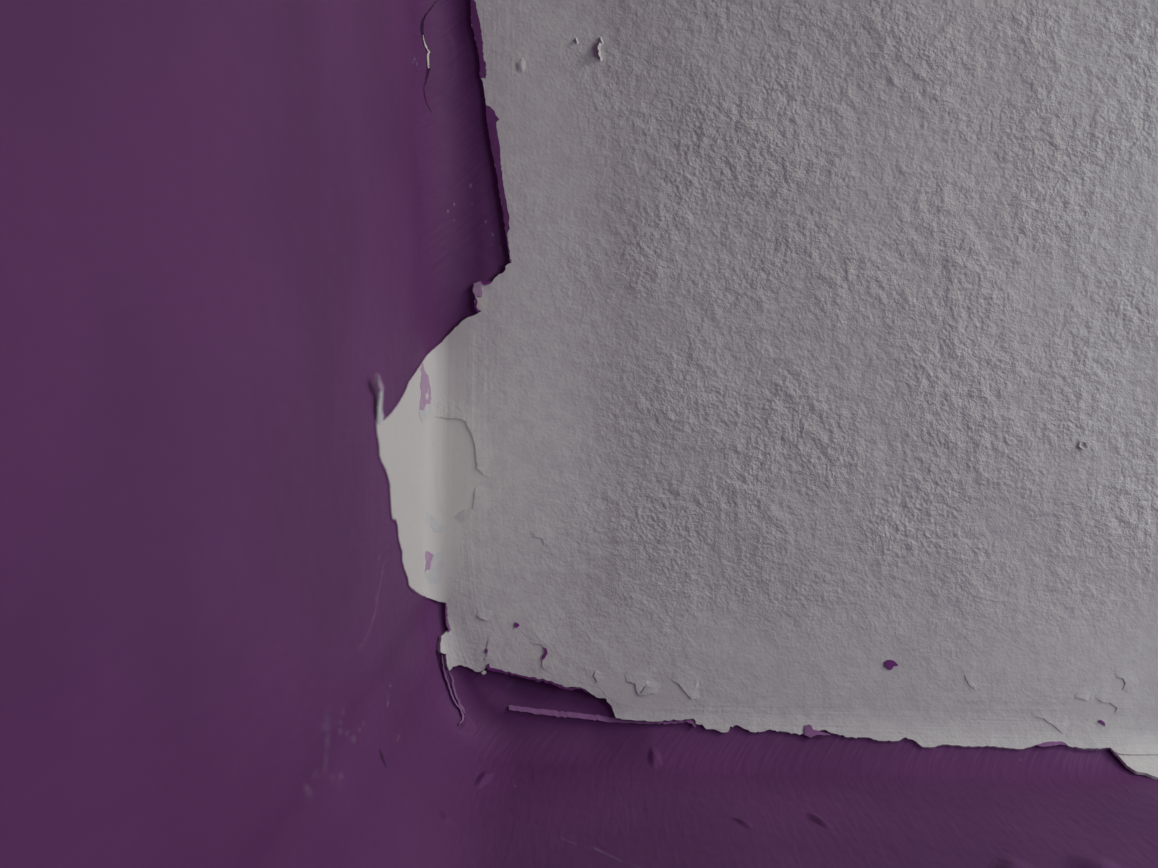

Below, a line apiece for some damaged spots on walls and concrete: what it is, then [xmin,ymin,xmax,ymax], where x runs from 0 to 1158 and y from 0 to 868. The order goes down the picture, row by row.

peeling [470,0,487,78]
peeling [486,105,511,261]
peeling [375,281,501,603]
peeling [525,624,567,673]
peeling [594,661,700,710]
peeling [1062,663,1139,719]
peeling [804,724,831,738]
peeling [1109,744,1158,780]